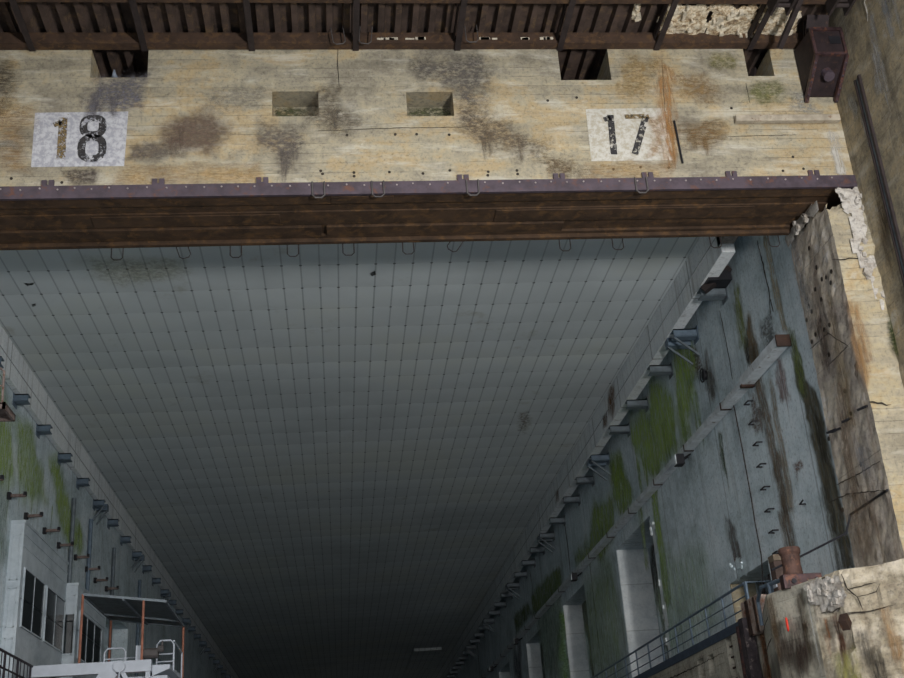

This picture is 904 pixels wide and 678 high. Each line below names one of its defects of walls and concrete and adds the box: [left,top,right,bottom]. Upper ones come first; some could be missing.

peeling [632,4,641,22]
peeling [657,4,802,38]
damp [258,124,303,174]
damp [411,55,540,158]
rust [627,57,723,160]
spalling [785,200,819,247]
spalling [835,187,885,310]
damp [739,310,759,365]
damp [755,377,795,546]
damp [794,348,853,570]
crack [827,461,885,520]
damp [756,574,820,670]